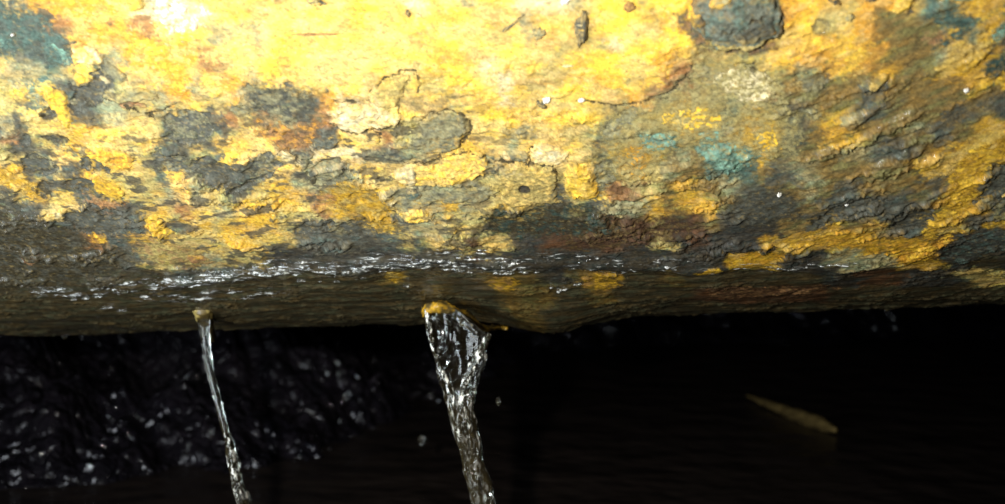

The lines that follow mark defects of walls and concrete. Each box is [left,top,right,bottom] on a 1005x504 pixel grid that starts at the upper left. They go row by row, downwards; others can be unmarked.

rust [673,12,778,57]
rust [255,119,318,151]
peeling [454,114,470,135]
rust [0,169,37,197]
rust [320,180,397,231]
rust [817,135,1005,265]
rust [88,232,107,244]
rust [561,211,699,252]
water stain [142,259,304,302]
water stain [391,249,529,275]
rust [581,271,624,292]
rust [696,268,723,276]